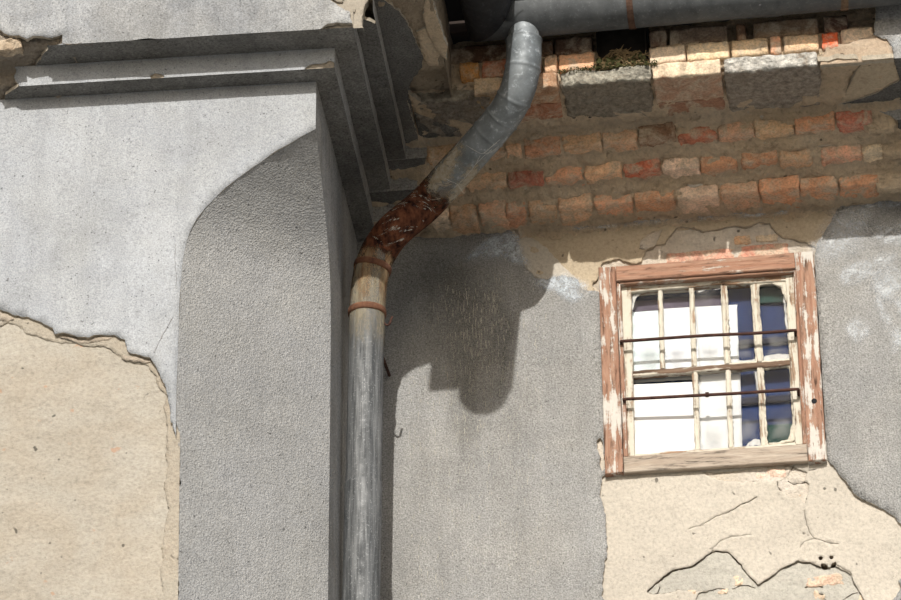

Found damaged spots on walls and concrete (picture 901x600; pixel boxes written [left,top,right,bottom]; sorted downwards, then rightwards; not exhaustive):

flaking render [0,32,62,100]
flaking render [325,0,506,185]
flaking render [415,7,901,295]
flaking render [0,311,180,600]
leakage [408,275,585,488]
flaking render [597,440,901,600]
crack [648,551,860,600]